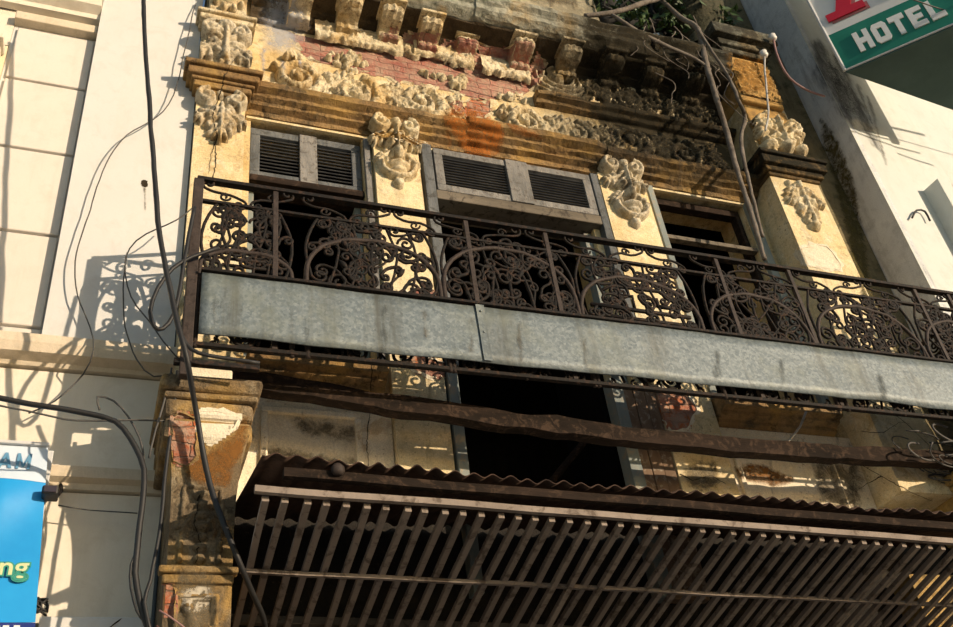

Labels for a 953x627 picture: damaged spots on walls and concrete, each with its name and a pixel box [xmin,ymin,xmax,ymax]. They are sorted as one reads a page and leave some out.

crack [208,59,235,177]
spalling [288,26,548,118]
rust [445,108,540,167]
damp [812,42,878,148]
spalling [167,407,242,470]
spalling [638,382,701,432]
damp [687,464,718,491]
spalling [162,583,182,622]